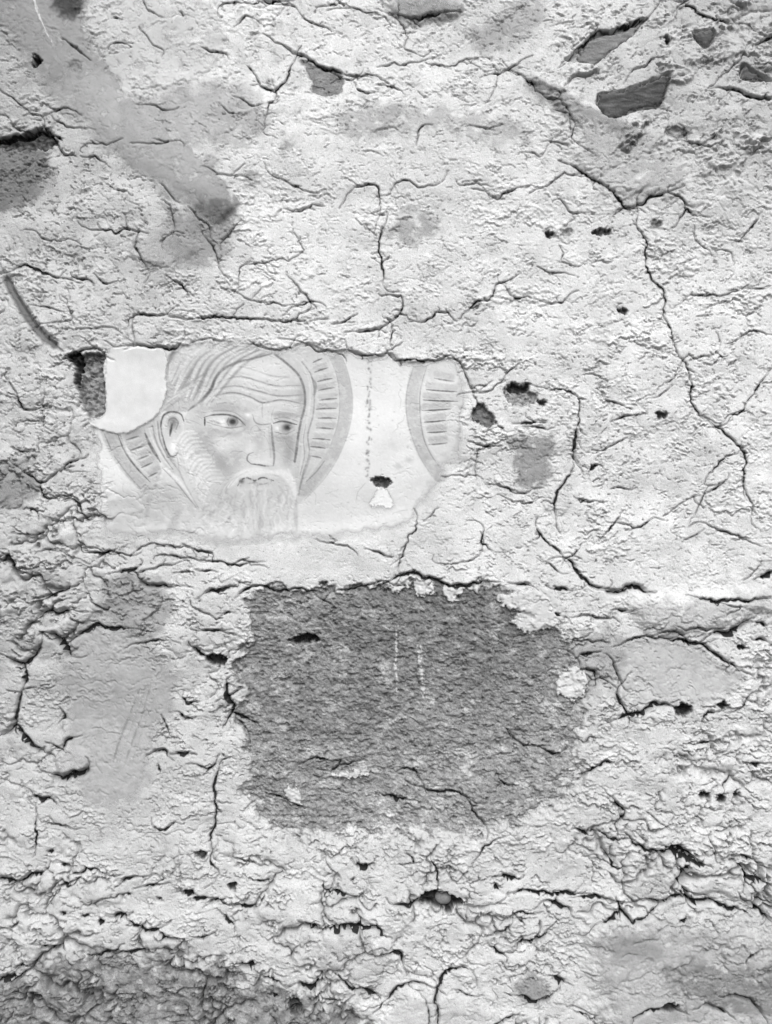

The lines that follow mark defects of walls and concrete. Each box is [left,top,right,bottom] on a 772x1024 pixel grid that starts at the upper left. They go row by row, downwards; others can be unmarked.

leakage [125,81,264,140]
leakage [167,208,228,264]
crack [201,179,434,365]
crack [470,58,690,339]
flaking render [576,23,642,66]
flaking render [598,76,671,118]
crack [12,451,490,657]
crack [499,383,771,745]
crack [1,583,265,956]
spalling [232,573,588,840]
crack [232,863,478,1024]
crack [490,797,771,954]